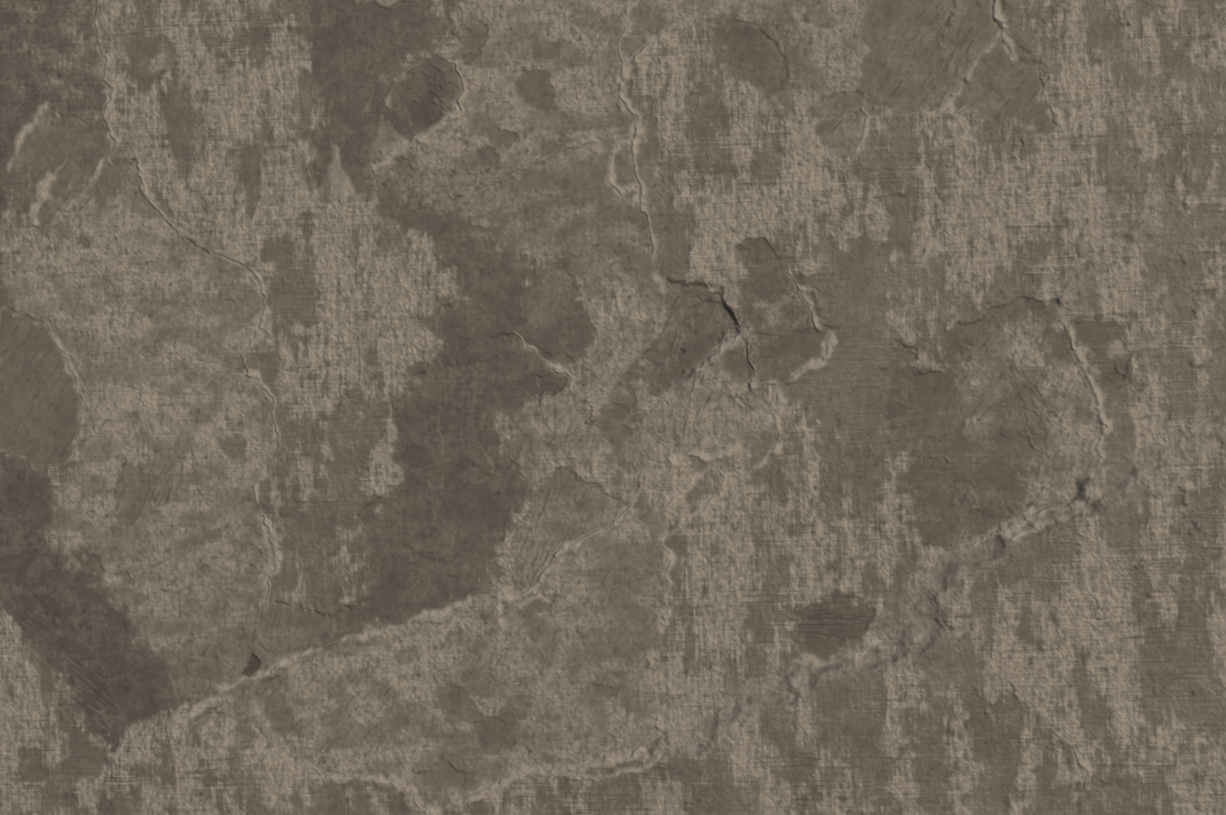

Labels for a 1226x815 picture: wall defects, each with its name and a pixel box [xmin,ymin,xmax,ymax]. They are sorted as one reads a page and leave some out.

spalling [0,0,876,815]
peeling [880,297,1133,551]